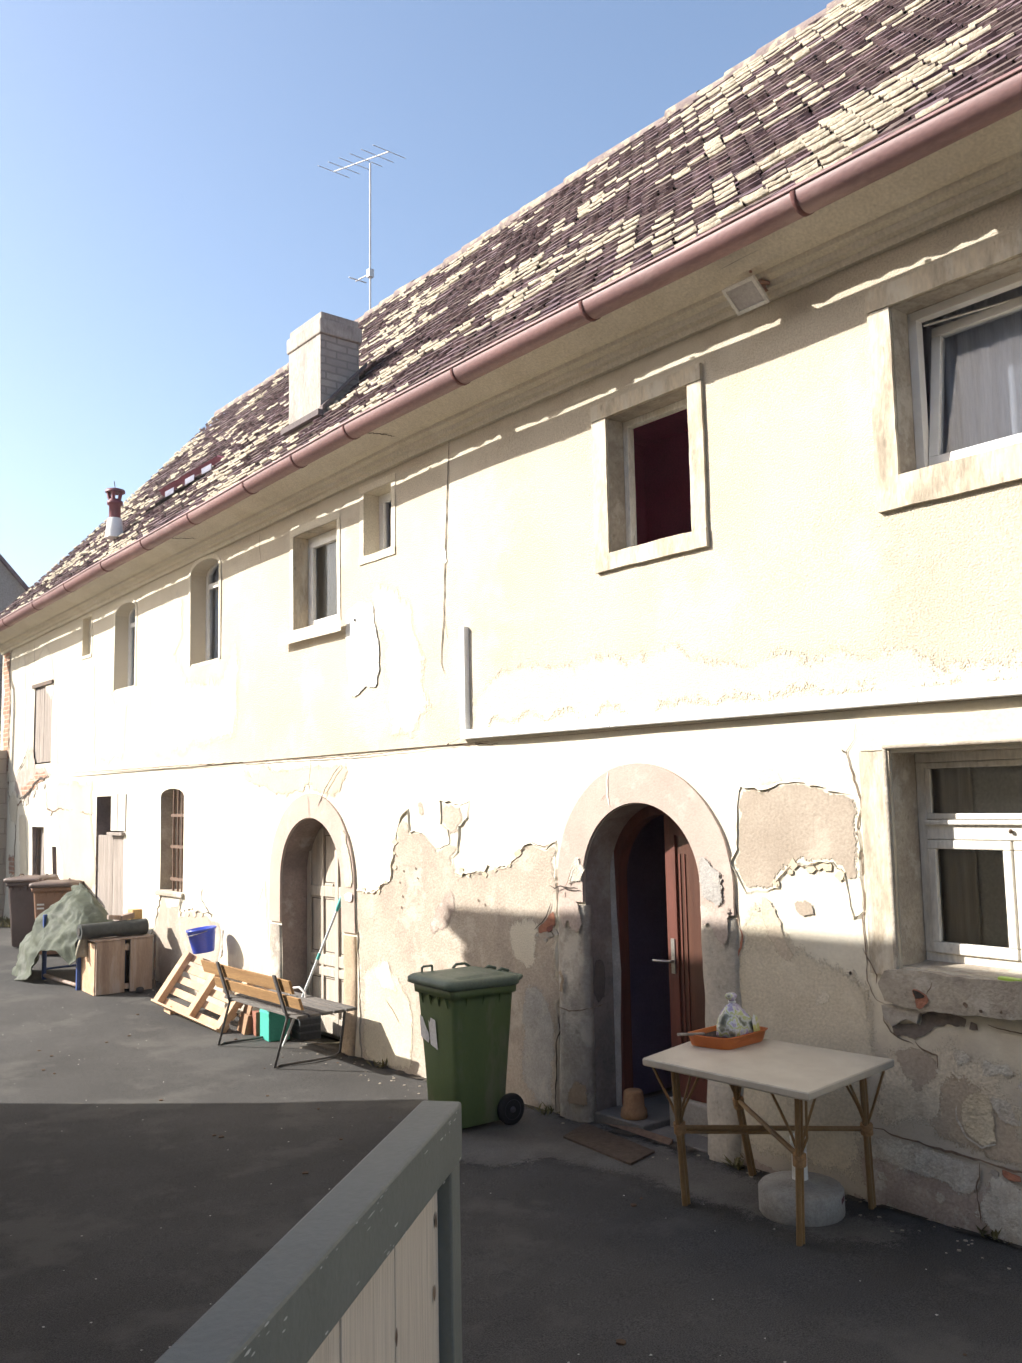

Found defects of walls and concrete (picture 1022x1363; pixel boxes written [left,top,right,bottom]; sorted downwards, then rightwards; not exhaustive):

crack [441,449,449,673]
flaking render [340,798,584,1114]
flaking render [697,768,867,961]
crack [841,724,884,1004]
spalling [881,983,1022,1092]
flaking render [845,1152,1022,1242]